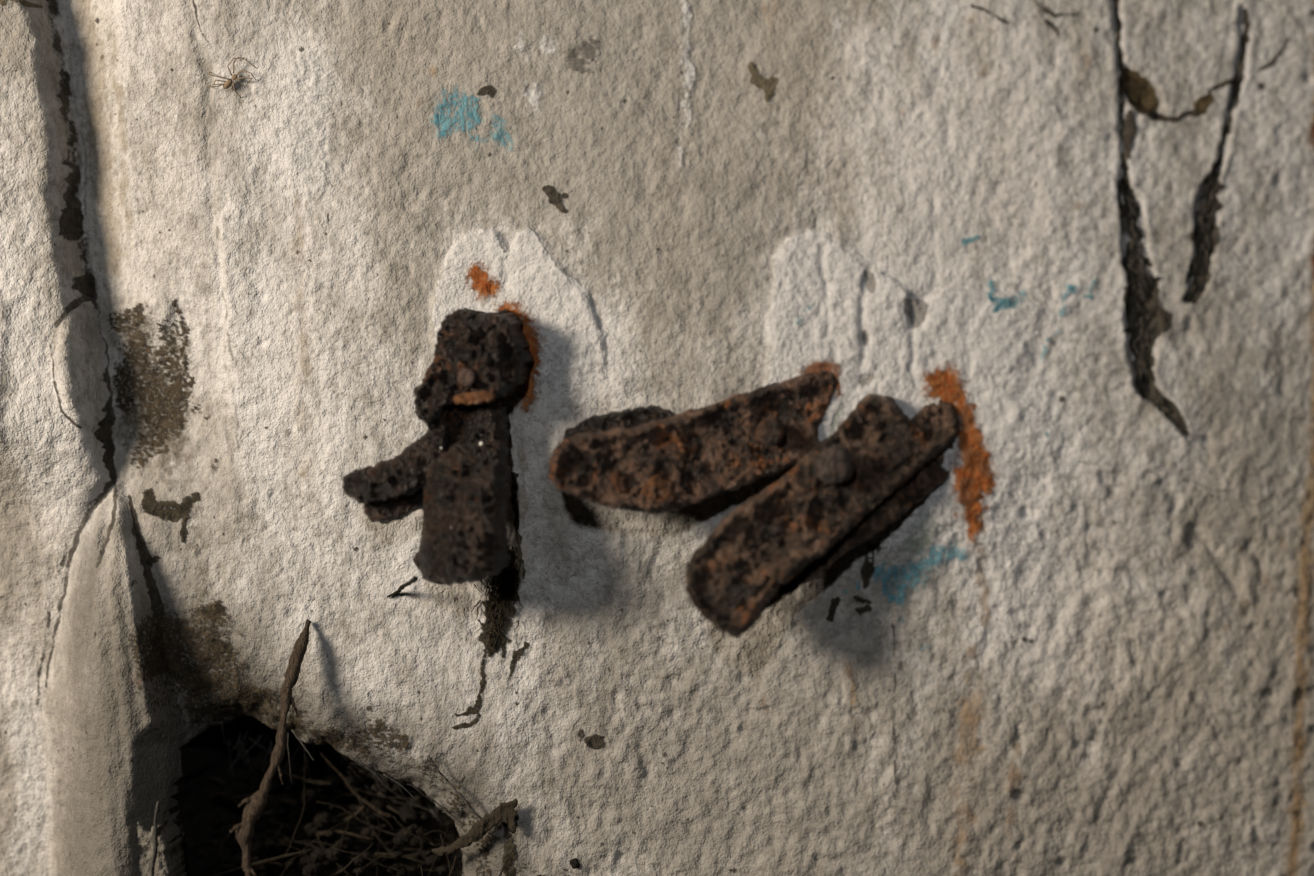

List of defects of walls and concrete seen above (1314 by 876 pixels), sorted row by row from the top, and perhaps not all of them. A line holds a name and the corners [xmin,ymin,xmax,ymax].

crack [970,4,1009,24]
crack [1033,1,1078,37]
crack [1113,0,1289,445]
crack [35,0,172,705]
mould [103,299,209,482]
corrosion [453,388,497,406]
corrosion [466,262,544,413]
corrosion [800,361,841,396]
corrosion [923,360,996,542]
water stain [124,598,495,876]